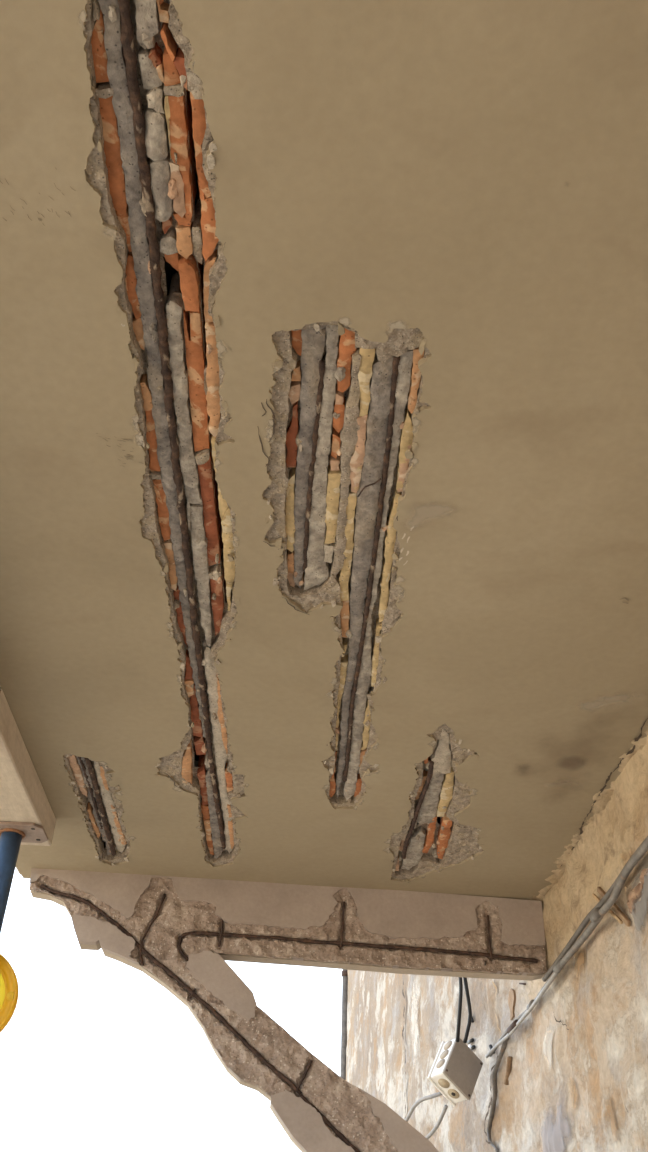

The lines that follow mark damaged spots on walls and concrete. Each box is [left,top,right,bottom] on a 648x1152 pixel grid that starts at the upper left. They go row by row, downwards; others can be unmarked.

spalling [117,0,240,851]
spalling [302,360,325,571]
spalling [323,356,400,782]
spalling [71,757,129,866]
spalling [393,760,434,872]
spalling [29,876,547,1152]